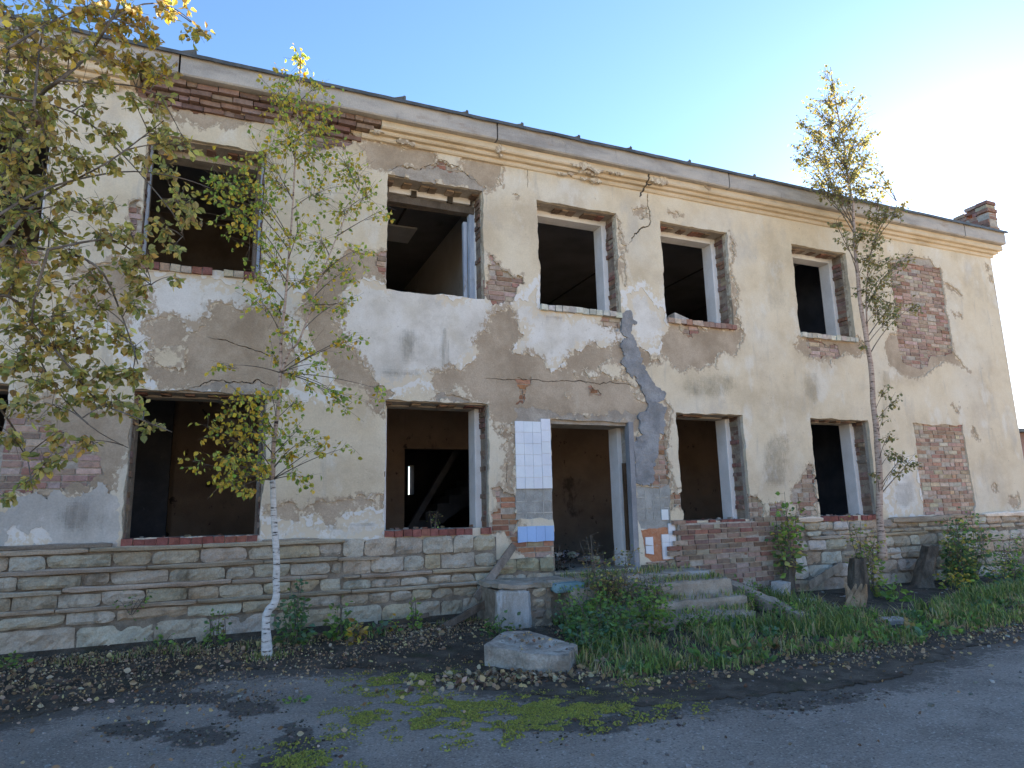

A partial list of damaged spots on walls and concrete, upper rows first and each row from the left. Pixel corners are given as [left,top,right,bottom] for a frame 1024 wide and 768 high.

flaking render [135,74,504,193]
flaking render [0,395,132,499]
flaking render [70,217,744,562]
flaking render [794,336,866,363]
flaking render [885,256,964,378]